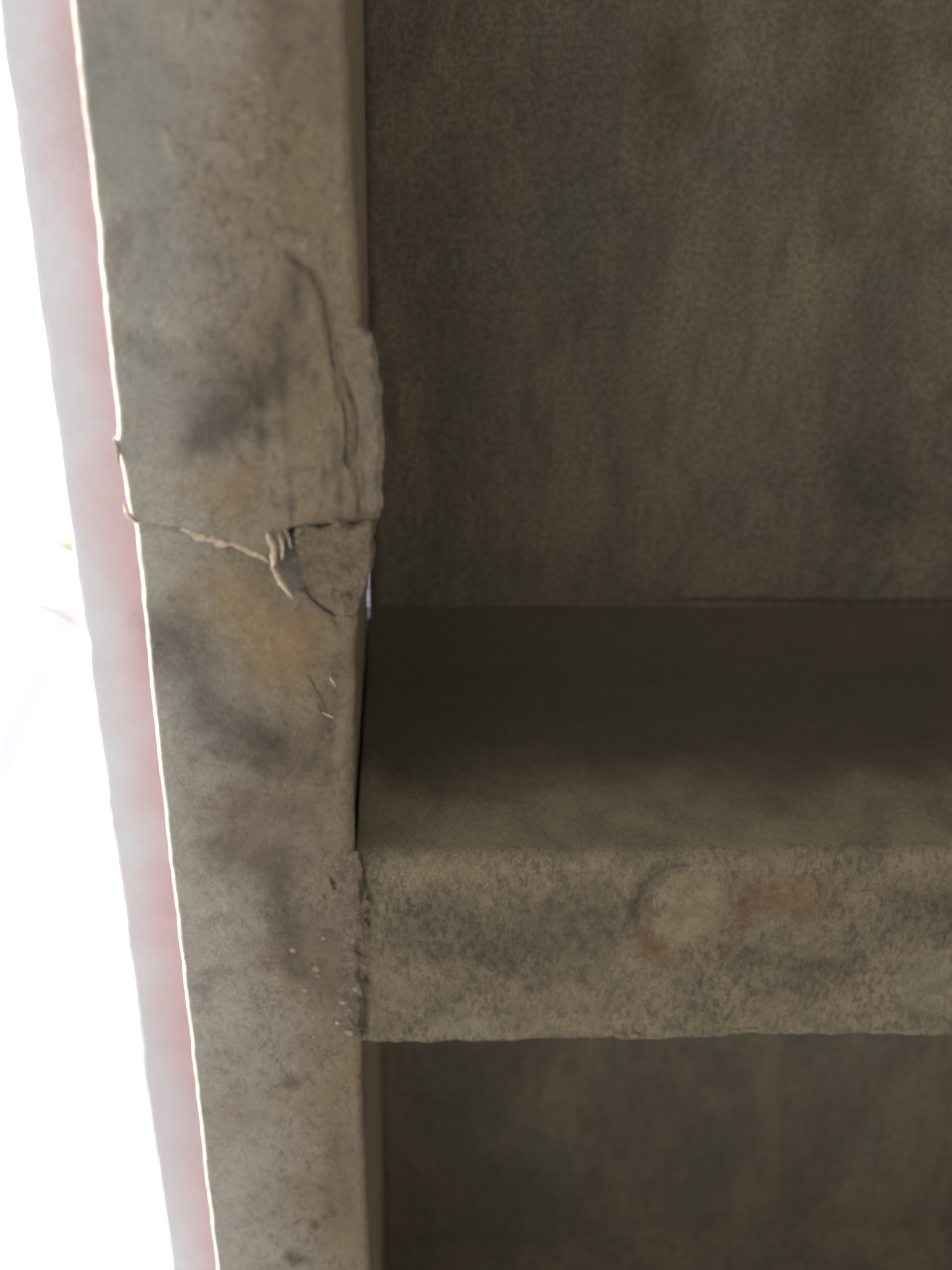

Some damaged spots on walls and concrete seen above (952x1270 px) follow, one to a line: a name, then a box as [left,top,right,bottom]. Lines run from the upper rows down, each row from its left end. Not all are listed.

crack [286,251,364,528]
crack [151,523,270,563]
spalling [266,519,377,638]